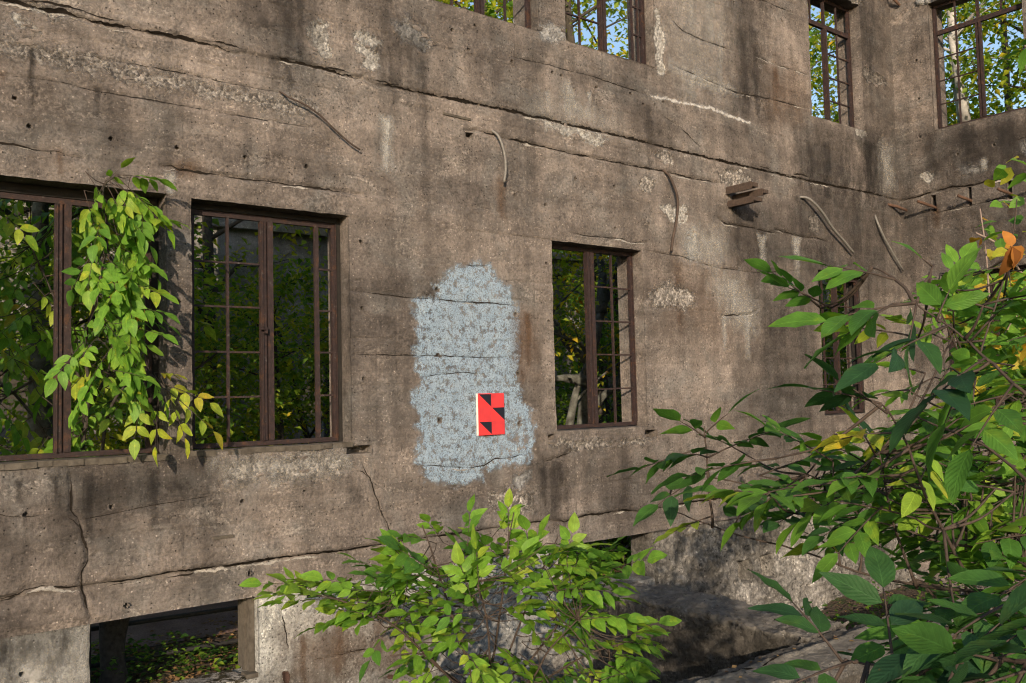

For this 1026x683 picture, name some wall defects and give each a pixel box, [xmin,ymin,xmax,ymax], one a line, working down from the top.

crack [1,467,632,619]